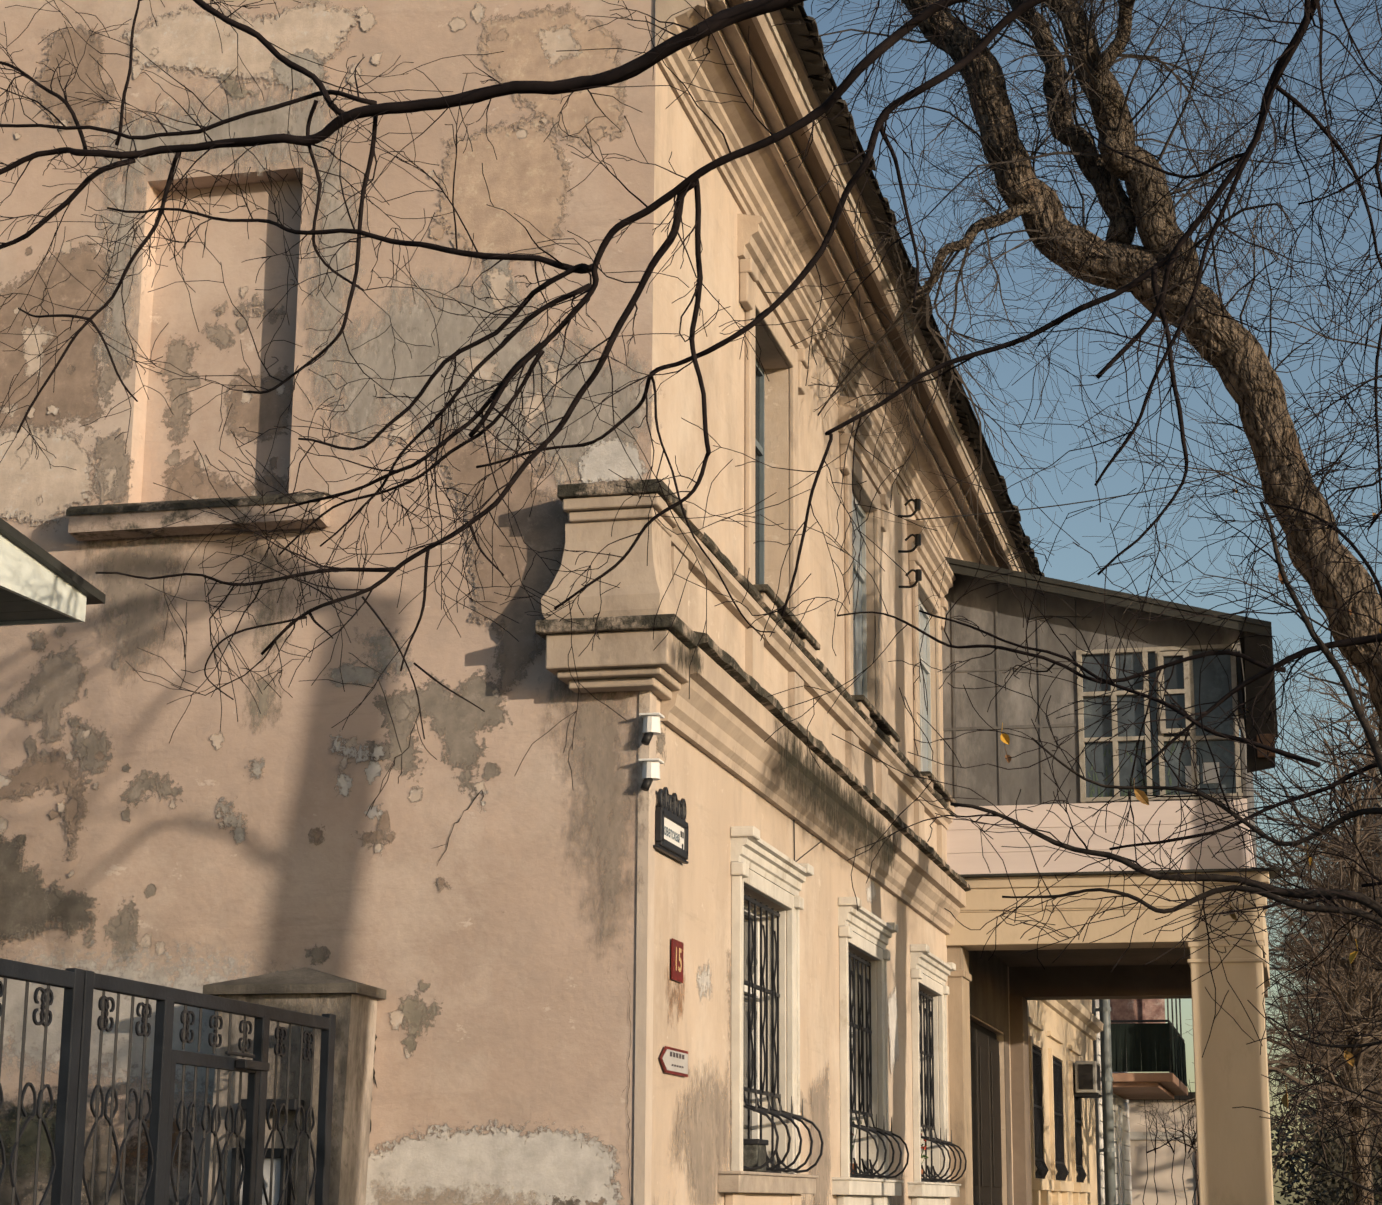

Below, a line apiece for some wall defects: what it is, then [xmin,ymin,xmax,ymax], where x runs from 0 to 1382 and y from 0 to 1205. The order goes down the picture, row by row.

flaking render [31,0,383,131]
flaking render [426,2,628,297]
flaking render [0,241,135,531]
flaking render [327,420,589,813]
flaking render [0,624,183,963]
flaking render [215,796,248,844]
flaking render [351,803,396,856]
water stain [550,678,642,944]
flaking render [389,980,443,1058]
flaking render [552,1194,607,1205]
water stain [674,1070,732,1205]
water stain [800,1068,831,1205]